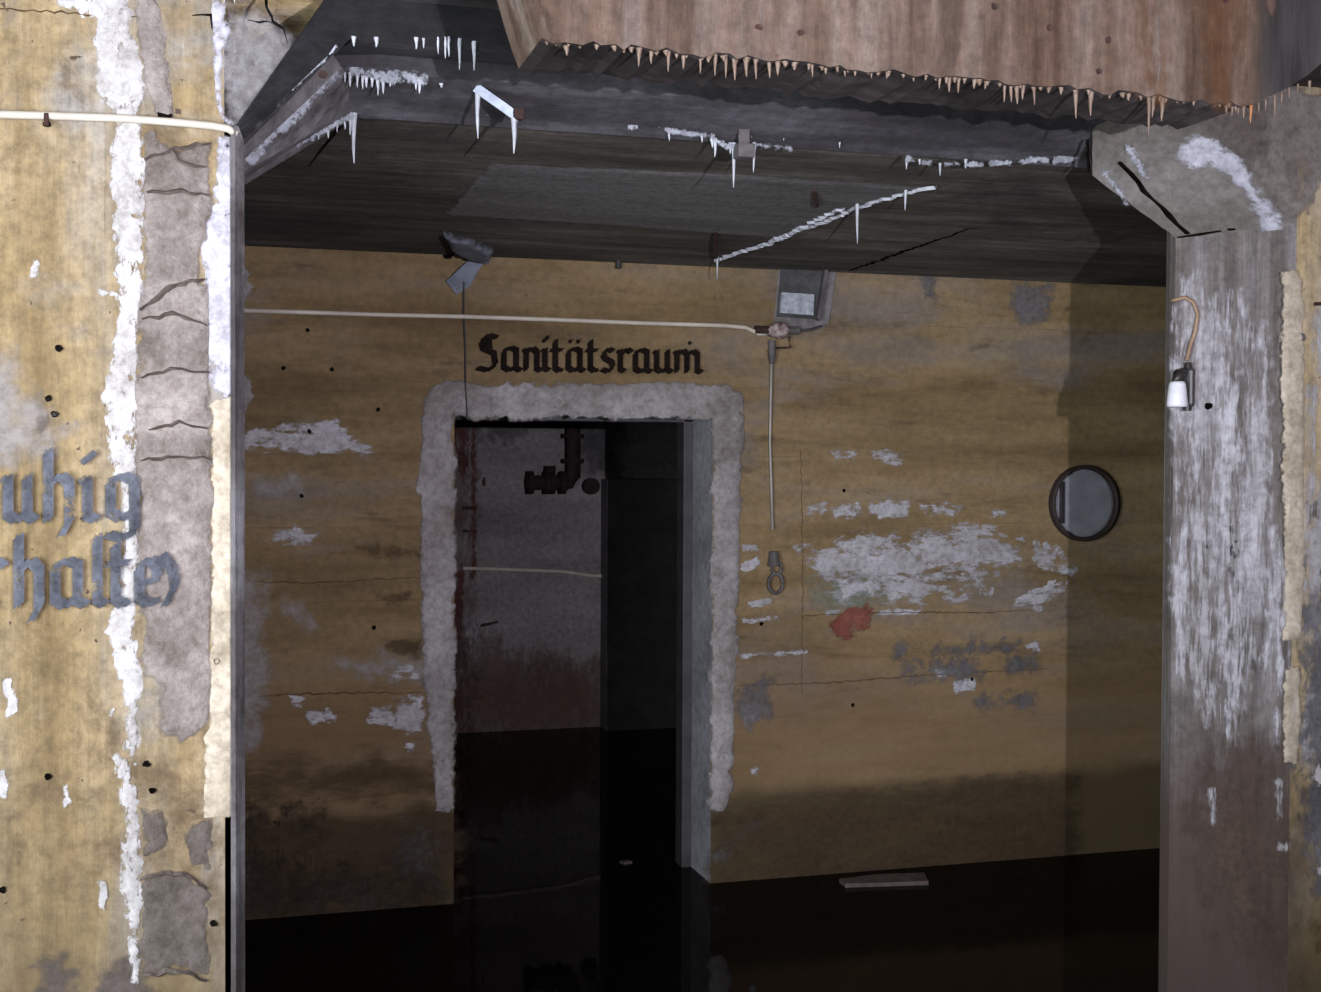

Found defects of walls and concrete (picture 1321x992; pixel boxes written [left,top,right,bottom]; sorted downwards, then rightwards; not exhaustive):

leakage [245,45,428,165]
crack [145,142,211,196]
crack [1085,139,1235,238]
leakage [1178,99,1282,231]
crack [139,278,207,326]
crack [141,419,210,461]
leakage [245,419,372,455]
peeling [832,449,903,466]
corrosion [454,420,486,640]
peeling [792,500,1078,612]
leakage [1170,270,1321,895]
leakage [713,781,1075,880]